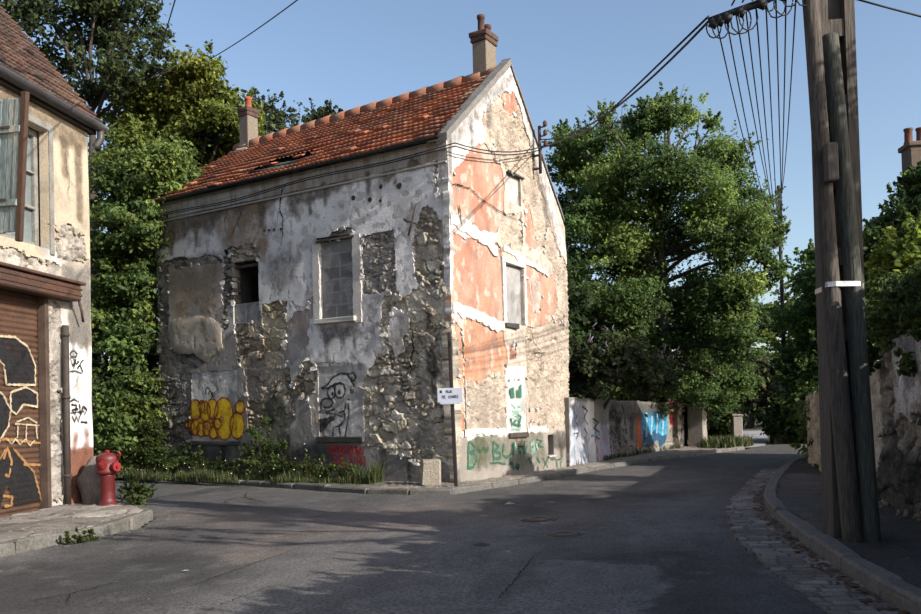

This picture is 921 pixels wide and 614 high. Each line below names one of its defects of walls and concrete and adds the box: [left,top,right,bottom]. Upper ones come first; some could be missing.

spalling [0,223,89,277]
spalling [48,300,64,503]
spalling [156,243,319,448]
leakage [160,178,353,255]
spalling [329,91,570,466]